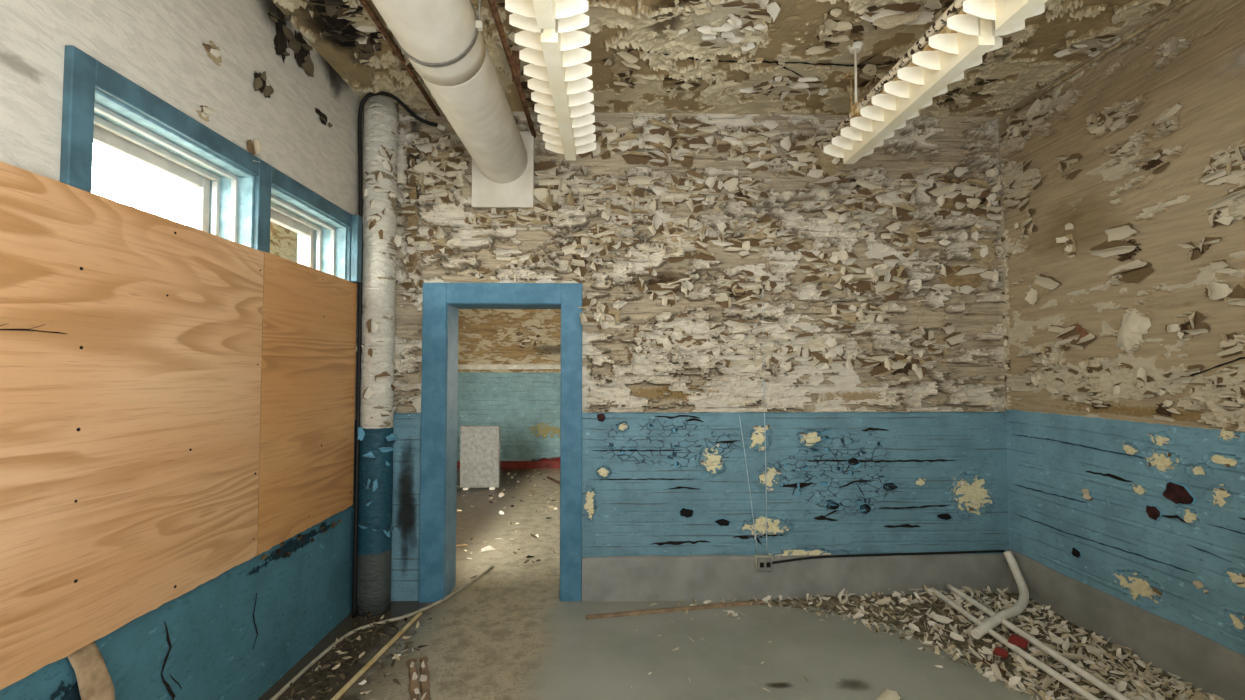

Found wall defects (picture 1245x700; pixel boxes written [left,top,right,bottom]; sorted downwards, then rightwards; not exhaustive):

peeling [805,0,963,55]
peeling [857,59,912,92]
peeling [354,74,1245,515]
crack [0,323,66,334]
peeling [247,519,342,576]
leakage [398,452,415,555]
crack [592,415,738,489]
crack [652,534,783,546]
peeling [741,516,789,538]
crack [780,427,956,528]
peeling [50,641,115,700]
crack [161,623,182,700]